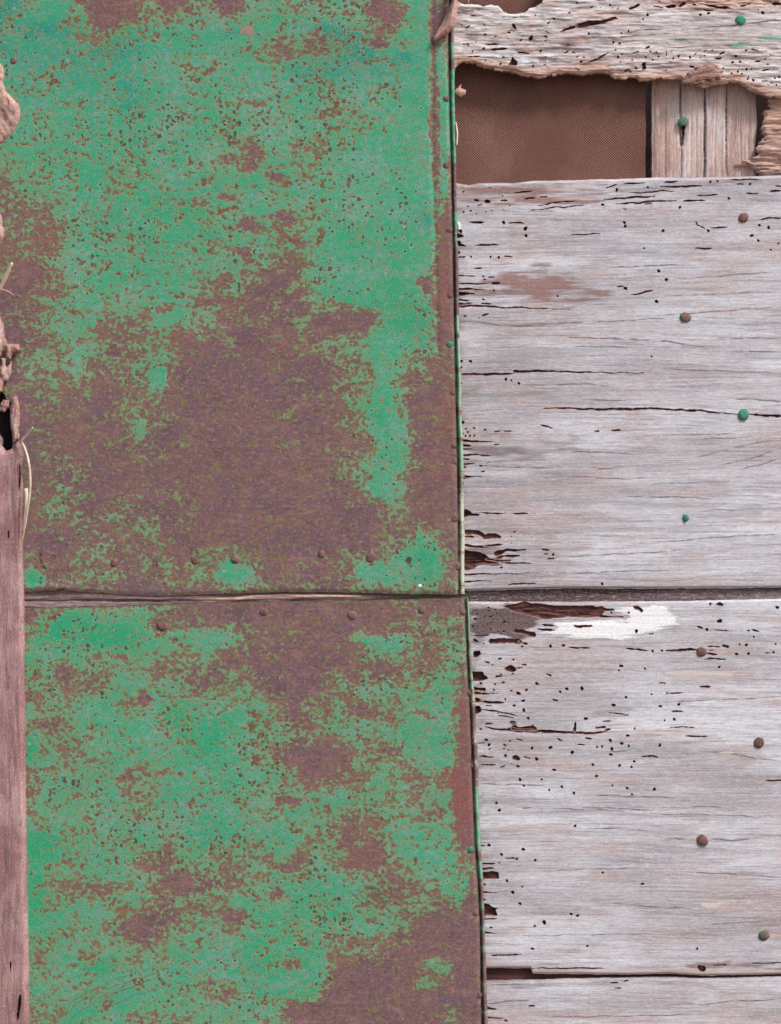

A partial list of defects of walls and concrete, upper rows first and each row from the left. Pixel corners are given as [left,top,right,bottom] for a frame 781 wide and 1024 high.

crack [531,89,727,211]
crack [459,303,781,511]
rust [0,0,481,1024]
crack [485,721,623,752]